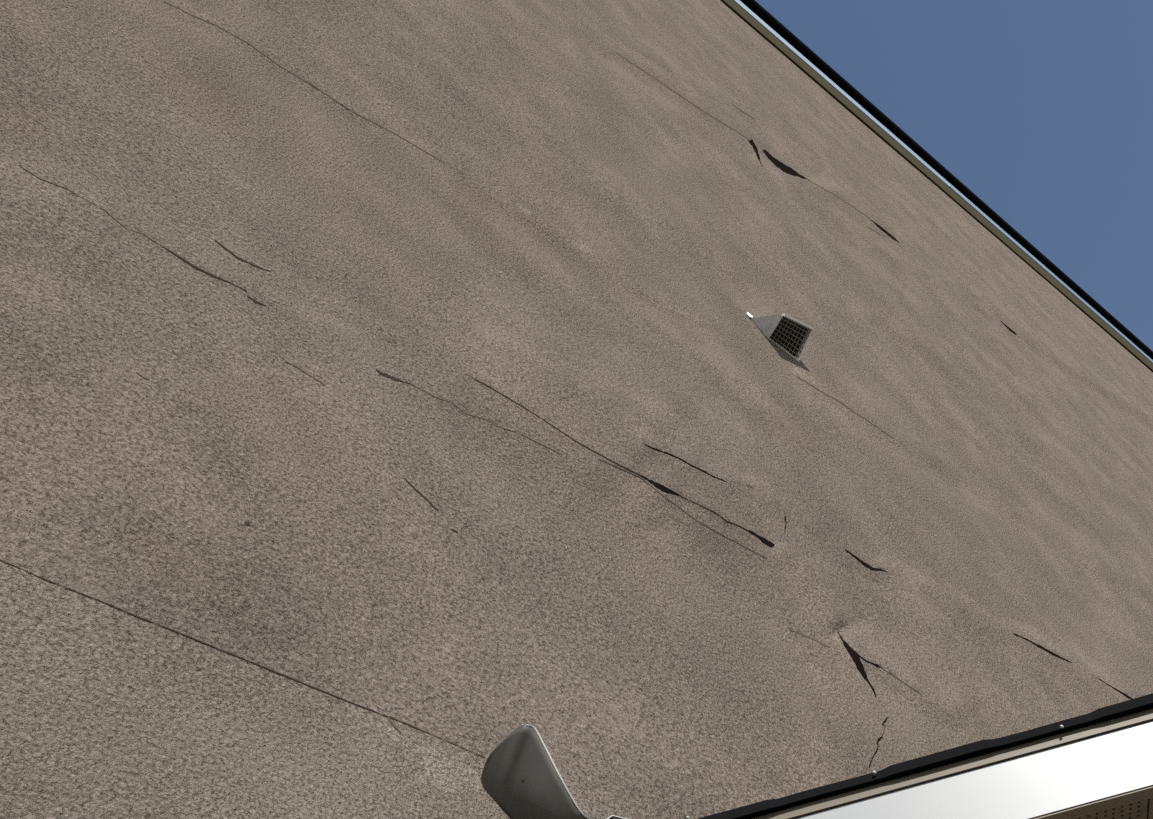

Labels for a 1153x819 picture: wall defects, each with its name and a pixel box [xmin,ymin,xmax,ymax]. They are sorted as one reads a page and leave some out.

crack [617,53,899,242]
crack [19,165,271,306]
crack [376,369,786,558]
crack [845,549,888,572]
crack [0,559,485,758]
crack [789,628,921,768]
crack [1013,633,1070,662]